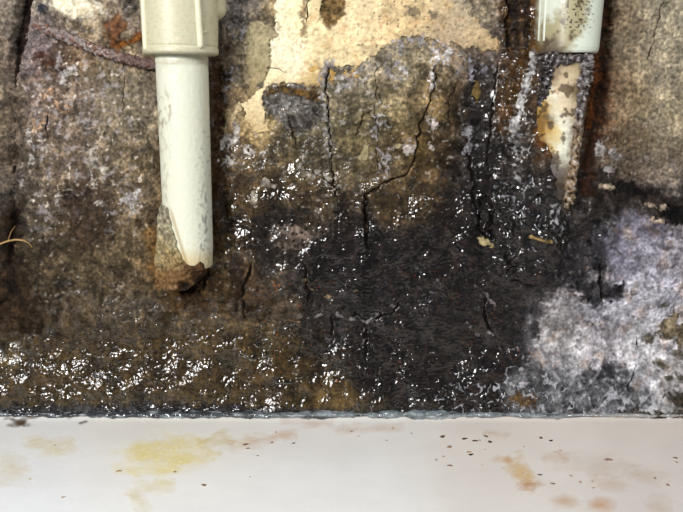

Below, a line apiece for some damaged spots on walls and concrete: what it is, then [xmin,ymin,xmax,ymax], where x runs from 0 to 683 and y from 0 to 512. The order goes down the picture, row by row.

crack [14,0,33,88]
rust [32,16,156,70]
leakage [217,122,266,167]
crack [314,66,338,201]
peeling [221,0,501,135]
peeling [358,145,369,162]
crack [356,64,456,255]
leakage [228,0,683,419]
rust [499,20,535,132]
rust [534,128,549,158]
rust [578,0,612,195]
leakage [0,328,317,413]